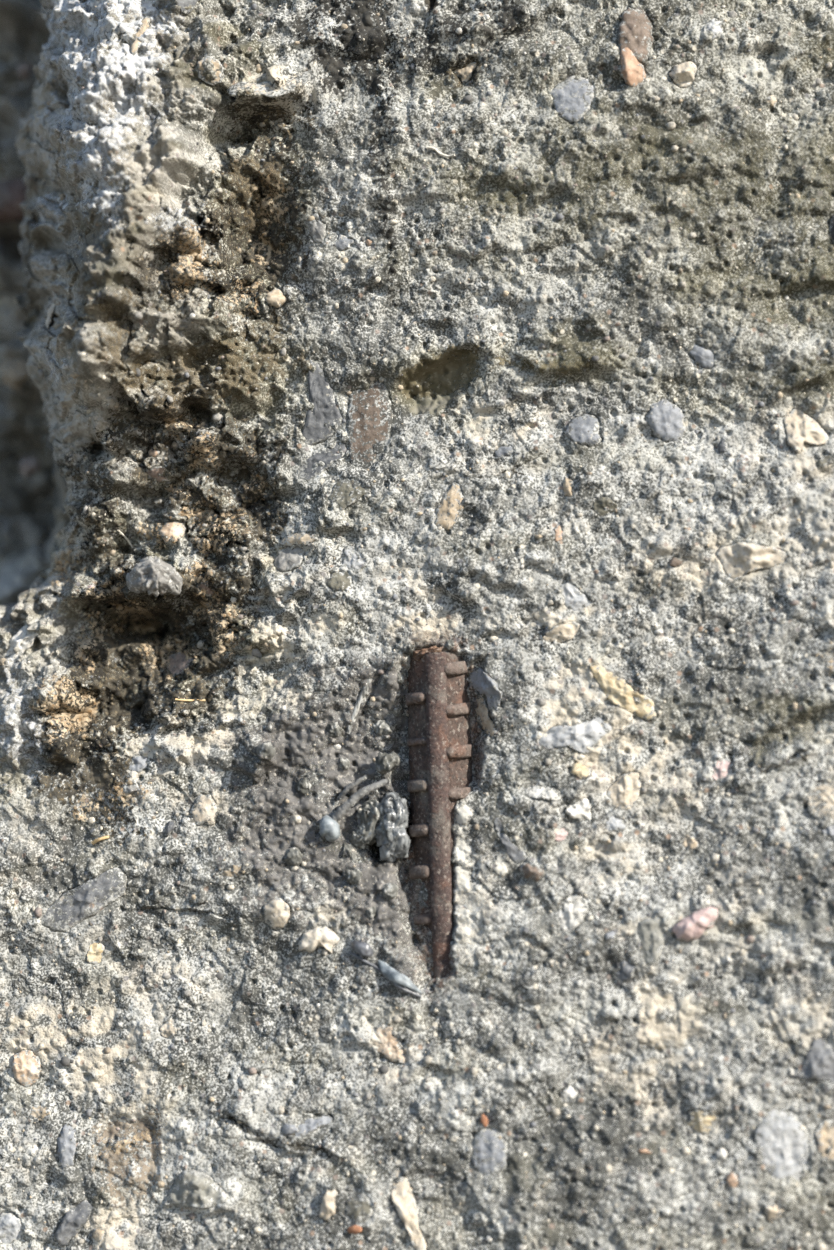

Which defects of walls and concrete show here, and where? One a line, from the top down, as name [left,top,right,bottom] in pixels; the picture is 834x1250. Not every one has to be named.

water stain [0,0,538,849]
spalling [212,628,433,995]
corrosion [403,631,481,988]
peeling [453,804,510,965]